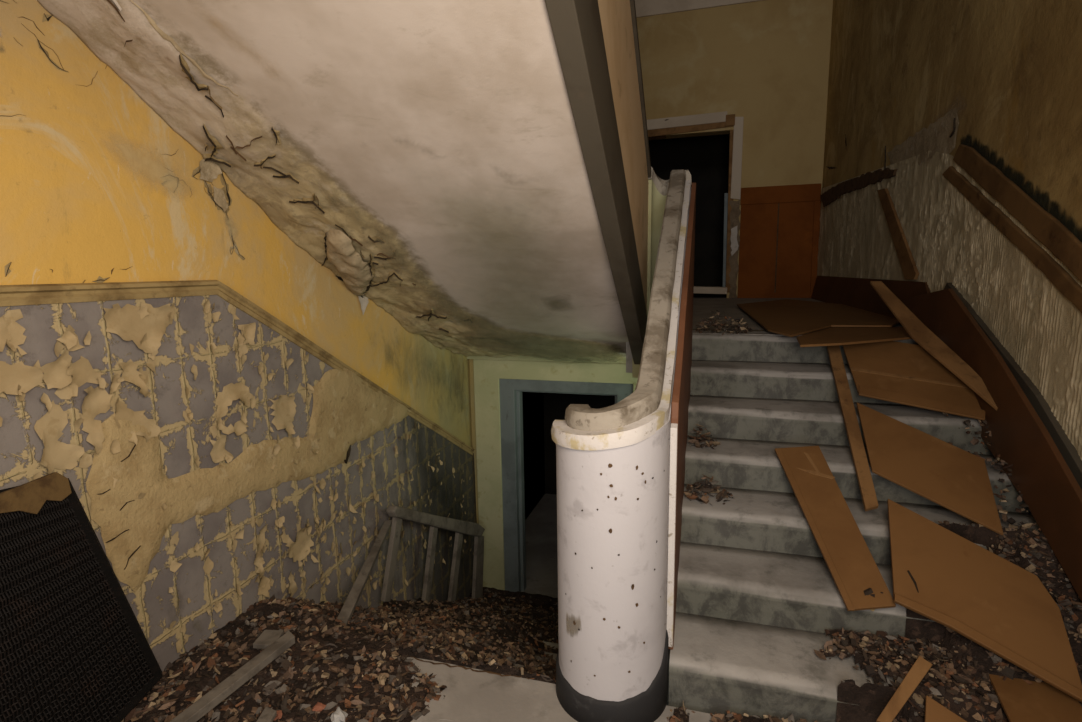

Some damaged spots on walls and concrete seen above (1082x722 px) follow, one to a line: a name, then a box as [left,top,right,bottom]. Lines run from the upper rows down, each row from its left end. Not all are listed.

crack [0,0,107,87]
spalling [107,0,238,96]
crack [162,53,325,260]
leakage [961,135,1082,242]
crack [349,235,416,287]
leakage [438,294,620,362]
spalling [0,300,470,598]